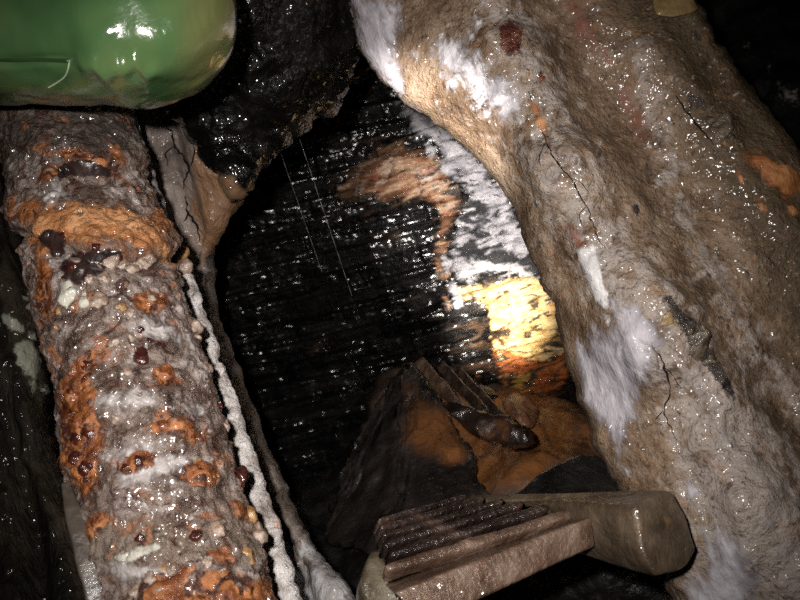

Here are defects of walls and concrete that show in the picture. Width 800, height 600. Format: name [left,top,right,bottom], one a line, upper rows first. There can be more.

corrosion [495,18,524,57]
corrosion [28,201,177,319]
crack [158,112,200,242]
corrosion [335,137,463,280]
efflorescence [350,0,540,309]
crack [528,92,607,251]
crack [676,90,714,145]
corrosion [57,348,110,543]
corrosion [116,449,157,475]
efflorescence [576,244,663,451]
crack [652,343,681,437]
corrosion [137,545,268,600]